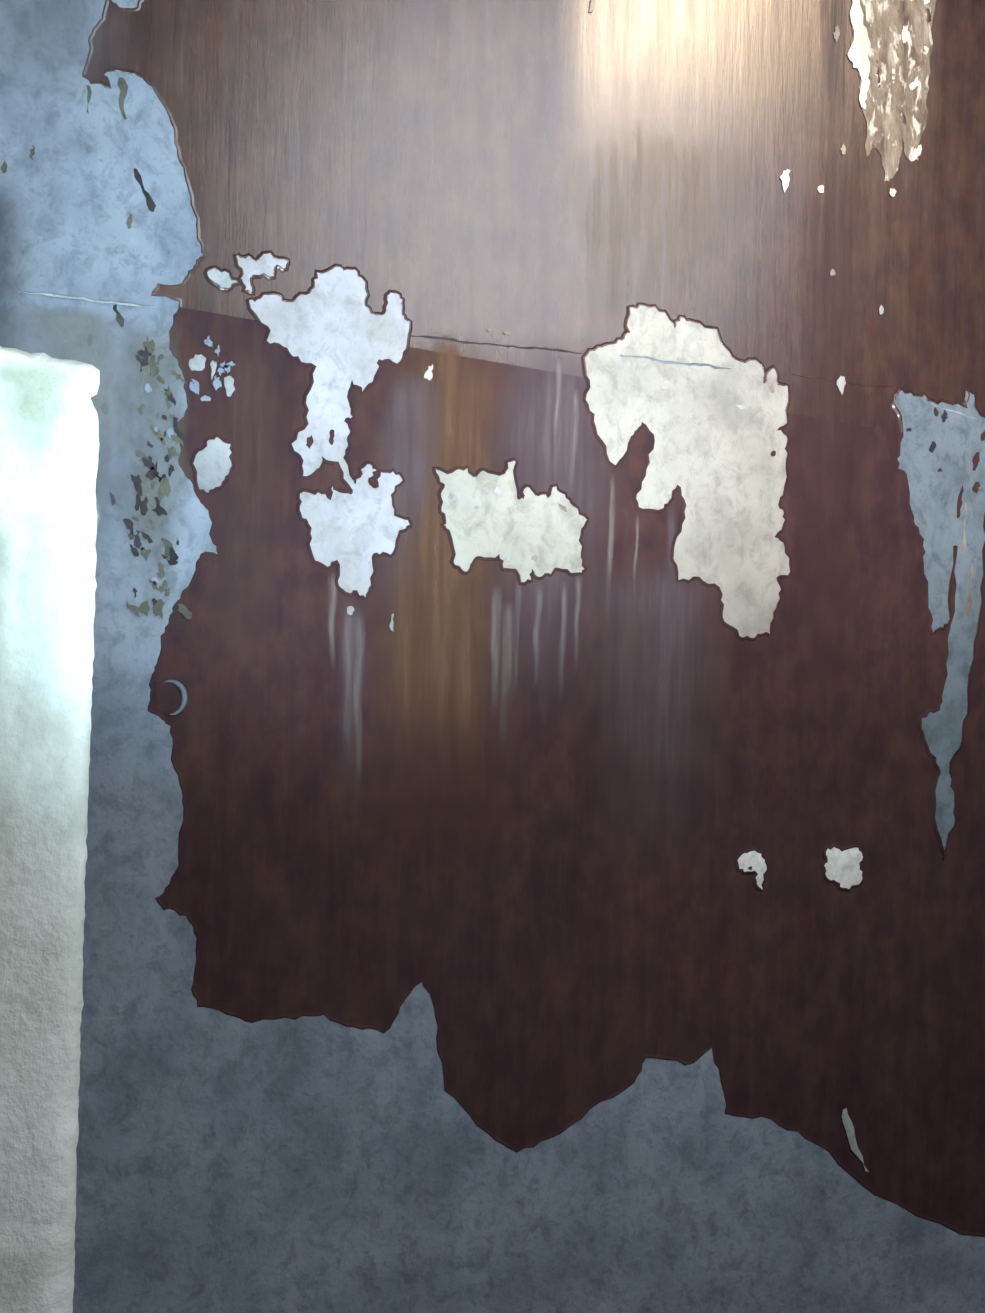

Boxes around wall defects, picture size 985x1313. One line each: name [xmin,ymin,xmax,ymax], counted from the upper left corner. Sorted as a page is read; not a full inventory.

peeling [82,0,207,431]
peeling [833,0,936,197]
peeling [203,250,413,601]
peeling [581,302,792,641]
peeling [148,388,985,1237]